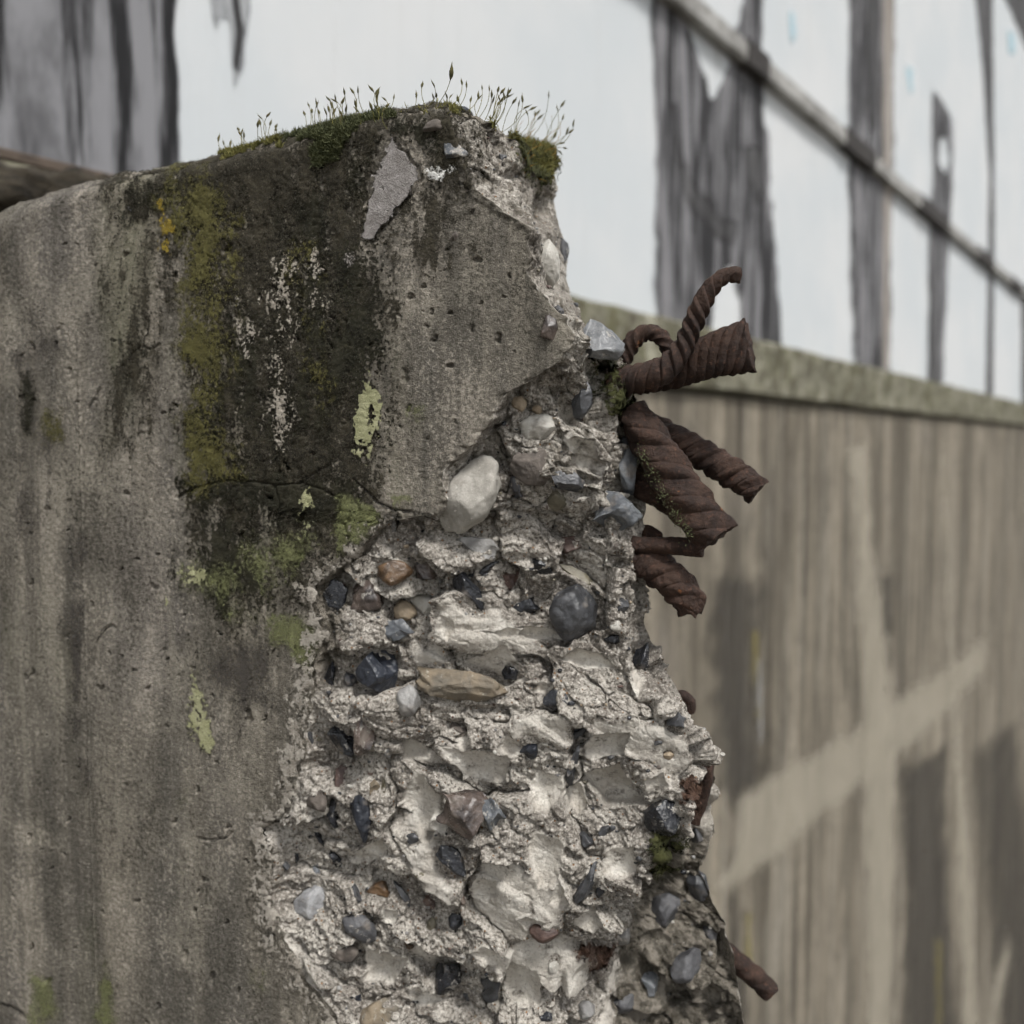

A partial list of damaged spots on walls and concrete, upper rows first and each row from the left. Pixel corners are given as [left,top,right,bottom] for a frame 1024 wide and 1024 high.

water stain [10,297,66,552]
water stain [84,101,495,738]
crack [356,482,436,530]
spalling [242,106,744,1024]
rust [605,266,769,619]
rust [729,942,778,1001]